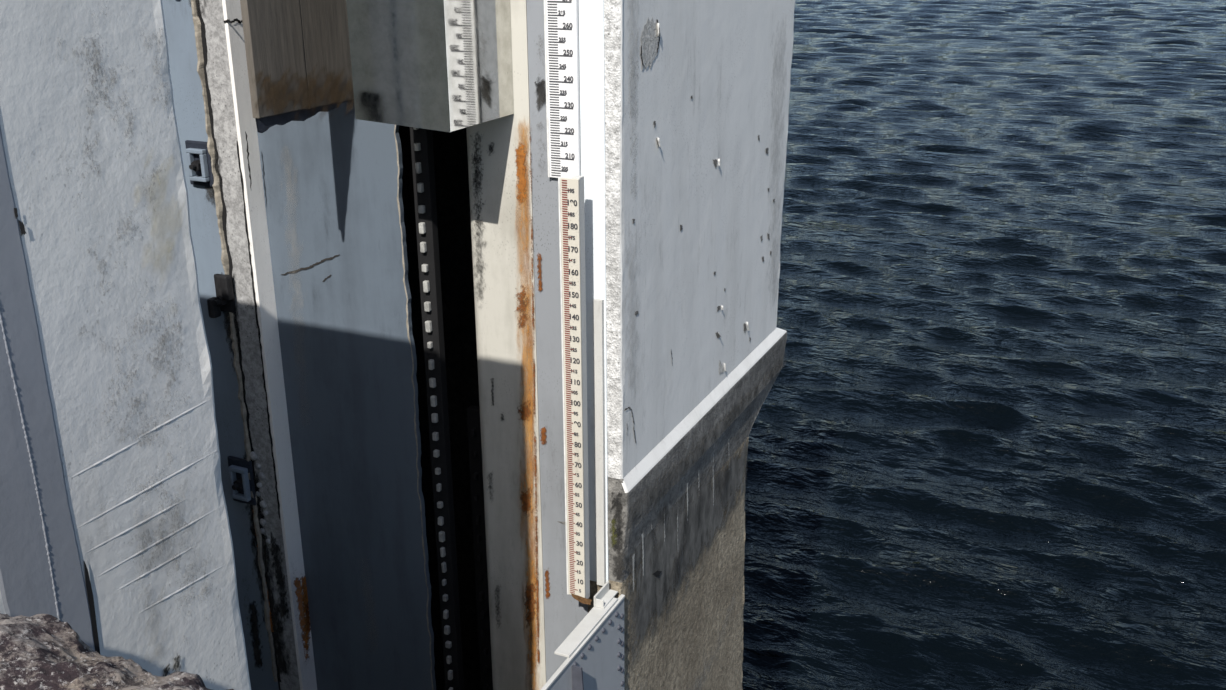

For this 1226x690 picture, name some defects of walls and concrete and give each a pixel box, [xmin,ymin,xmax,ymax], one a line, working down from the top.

peeling [640,17,660,70]
rust [293,576,310,662]
rust [515,128,550,690]
leakage [611,360,786,662]